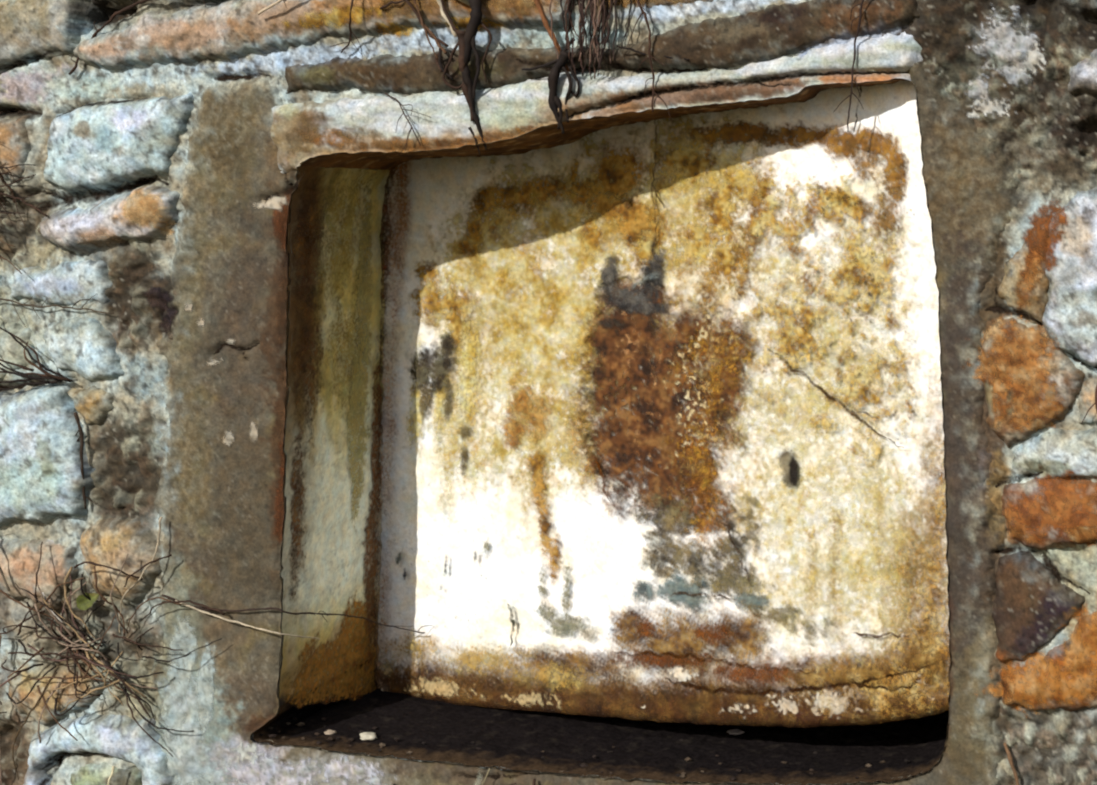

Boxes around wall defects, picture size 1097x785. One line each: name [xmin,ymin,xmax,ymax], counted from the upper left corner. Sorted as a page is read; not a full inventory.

crack [515,58,908,256]
damp [410,116,943,661]
crack [767,348,904,448]
crack [614,651,933,695]